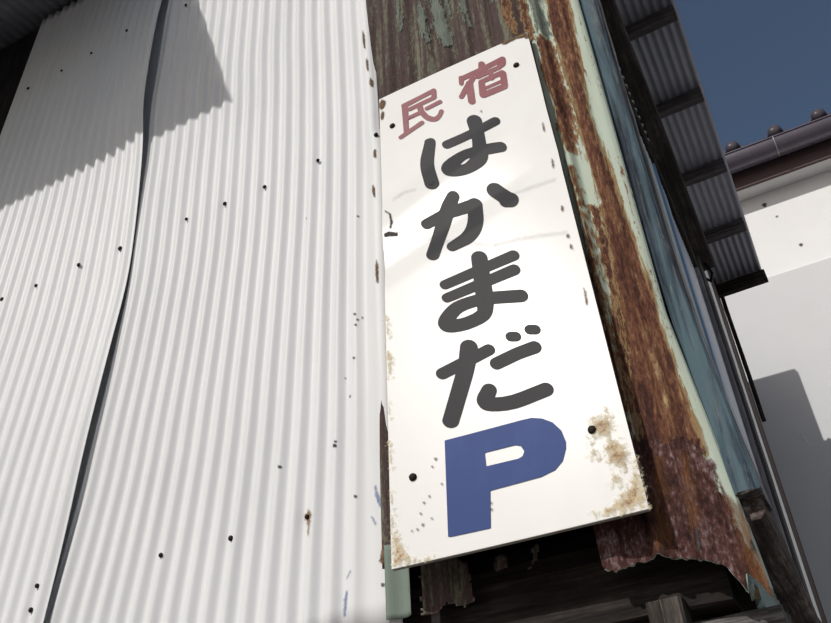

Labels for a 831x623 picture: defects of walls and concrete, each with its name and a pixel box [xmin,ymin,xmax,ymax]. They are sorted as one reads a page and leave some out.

peeling [417,0,473,47]
peeling [501,0,552,44]
corrosion [366,0,773,620]